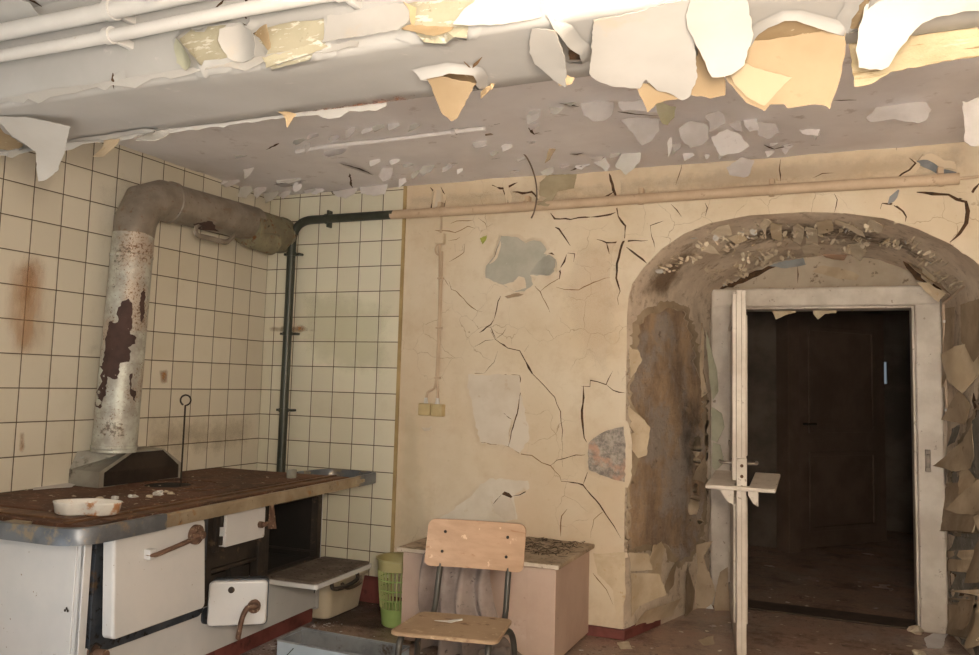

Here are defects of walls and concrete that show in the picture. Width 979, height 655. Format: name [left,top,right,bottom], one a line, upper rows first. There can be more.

peeling [0,0,979,207]
crack [275,163,372,194]
peeling [480,233,562,298]
crack [492,153,708,312]
crack [720,266,774,289]
crack [903,261,941,290]
crack [880,148,979,254]
peeling [436,474,533,523]
peeling [464,370,534,454]
crack [430,187,629,599]
spalling [584,300,724,626]
peeling [655,219,979,655]